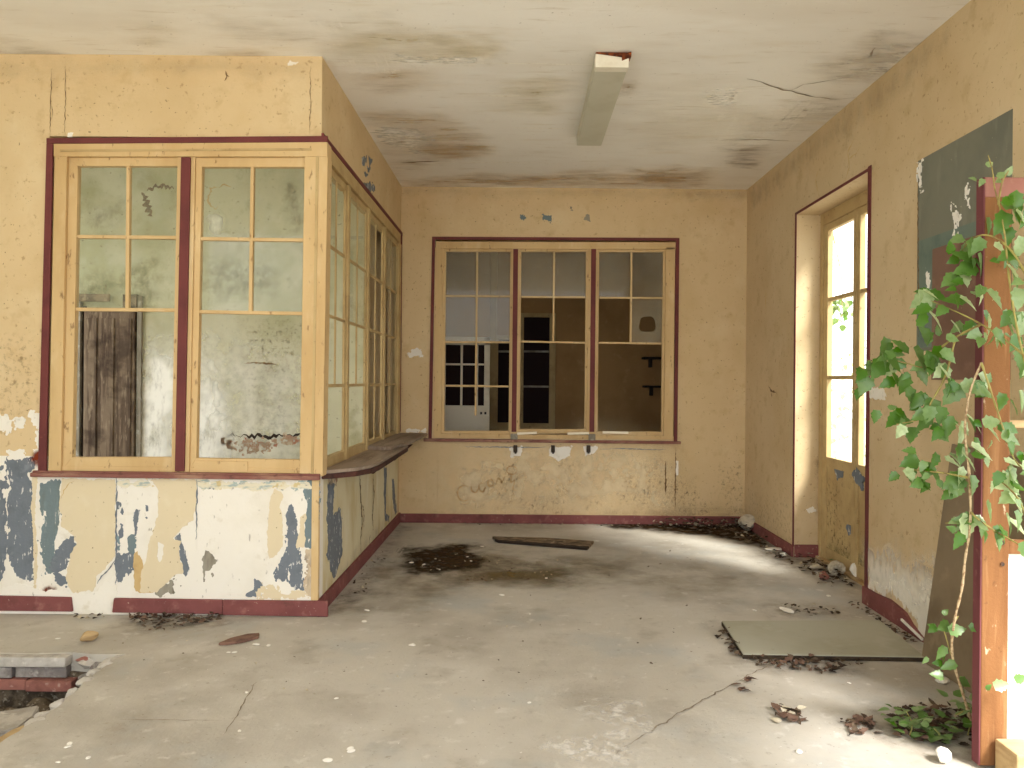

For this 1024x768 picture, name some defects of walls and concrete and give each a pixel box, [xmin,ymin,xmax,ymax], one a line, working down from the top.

crack [750,76,857,99]
peeling [916,158,924,194]
peeling [950,182,971,236]
spalling [549,445,598,462]
peeling [0,410,343,612]
peeling [384,467,397,522]
damp [398,544,560,581]
crack [223,683,255,735]
crack [616,666,767,754]